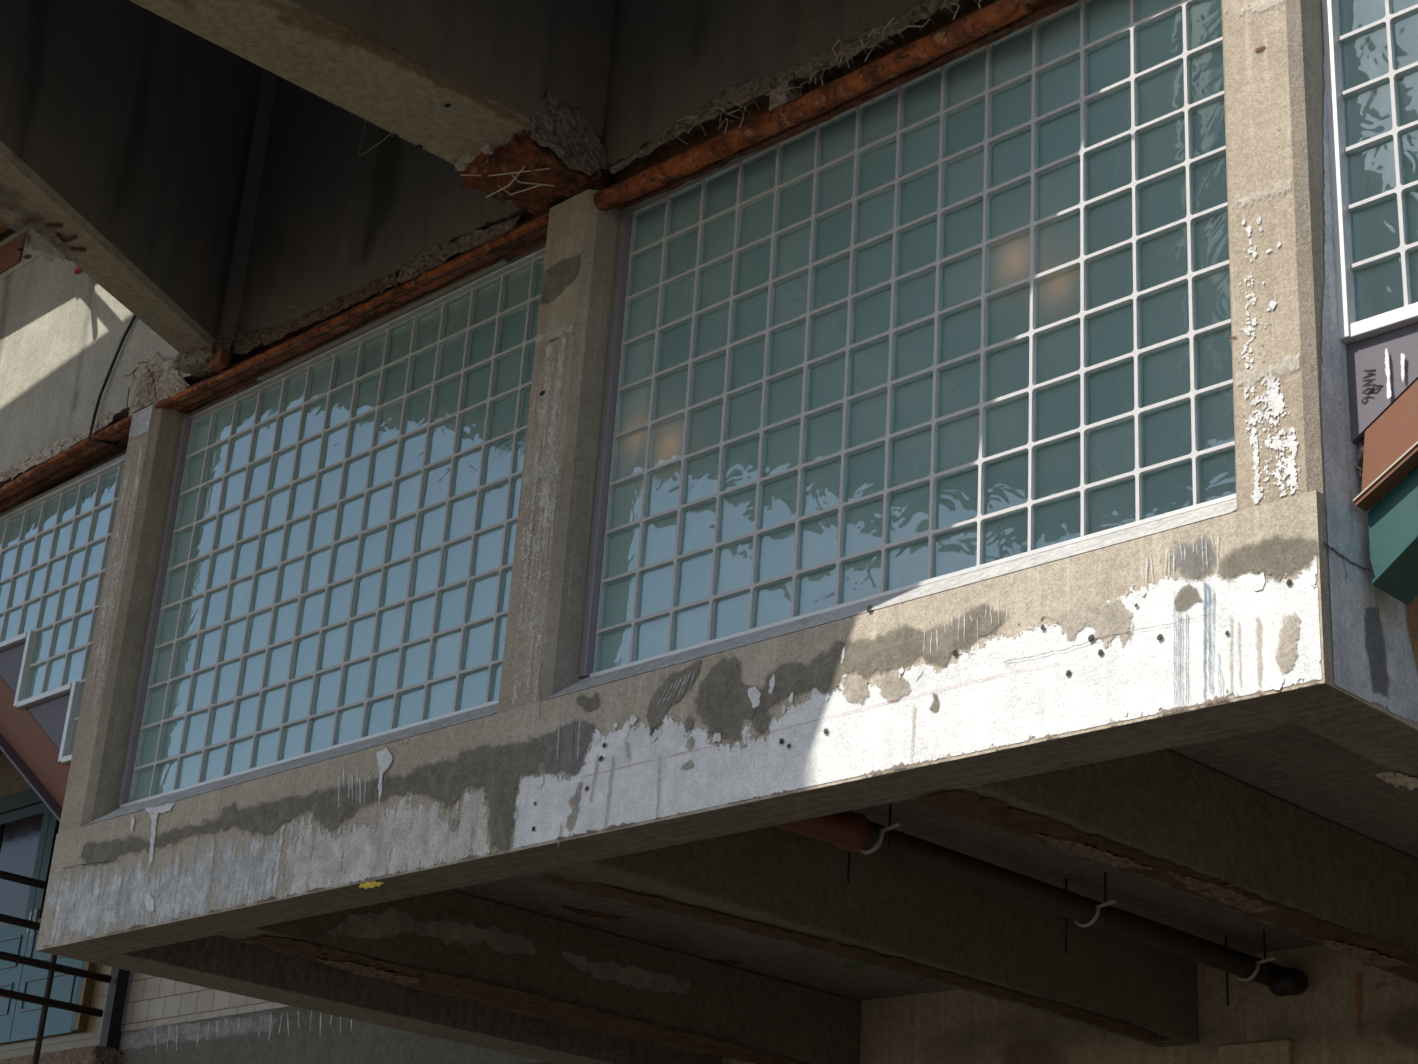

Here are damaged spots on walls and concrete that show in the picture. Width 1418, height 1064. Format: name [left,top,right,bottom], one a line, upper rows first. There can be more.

spalling [231,0,959,355]
peeling [170,54,1418,921]
damp [46,693,599,945]
peeling [326,907,540,956]
peeling [559,951,691,995]